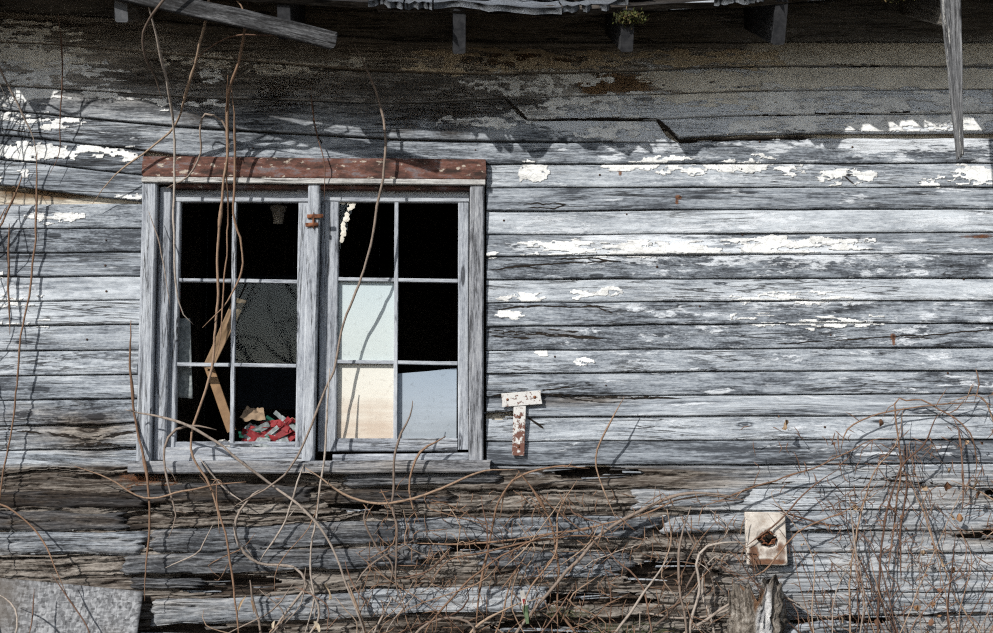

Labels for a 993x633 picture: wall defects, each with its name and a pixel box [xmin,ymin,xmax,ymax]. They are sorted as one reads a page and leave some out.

peeling [158,51,367,84]
peeling [0,19,231,178]
crack [504,96,934,143]
peeling [518,159,550,182]
peeling [919,163,993,189]
damp [3,188,88,199]
peeling [517,234,876,258]
corrosion [749,530,785,565]